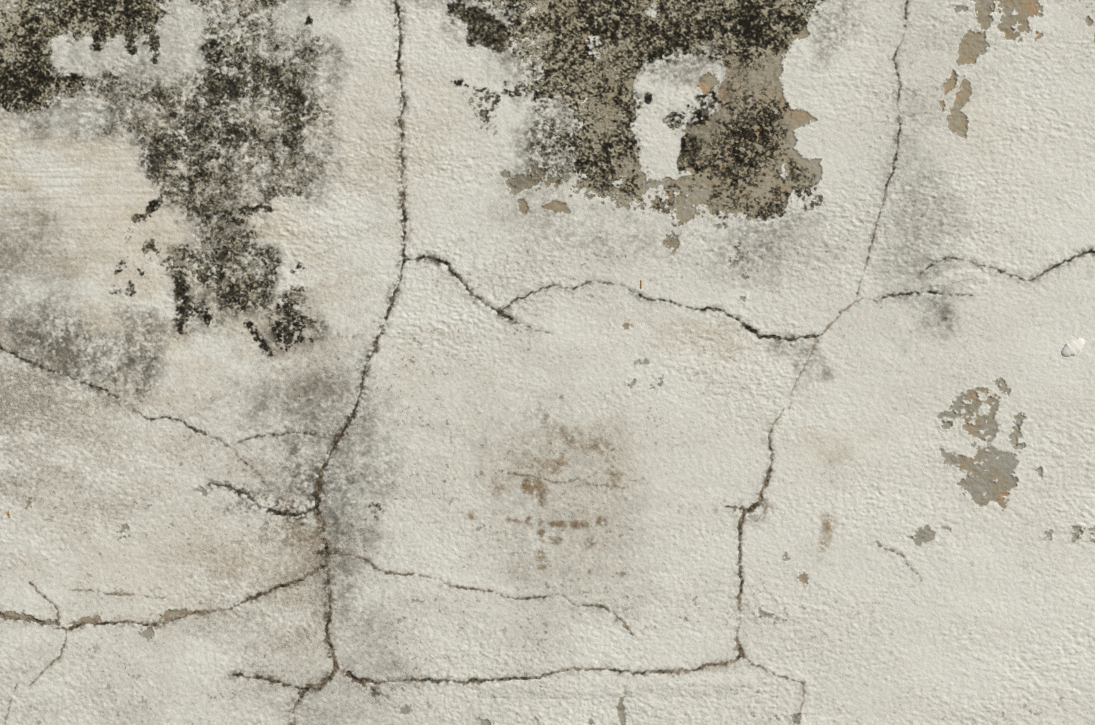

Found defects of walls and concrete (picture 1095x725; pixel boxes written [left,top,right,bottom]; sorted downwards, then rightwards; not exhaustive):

leakage [0,0,334,356]
leakage [447,0,826,227]
peeling [500,0,824,253]
crack [865,47,917,268]
peeling [940,0,1043,138]
leakage [12,305,162,394]
crack [0,0,861,725]
crack [874,290,973,301]
crack [922,248,1095,281]
peeling [938,378,1026,511]
peeling [617,696,626,725]